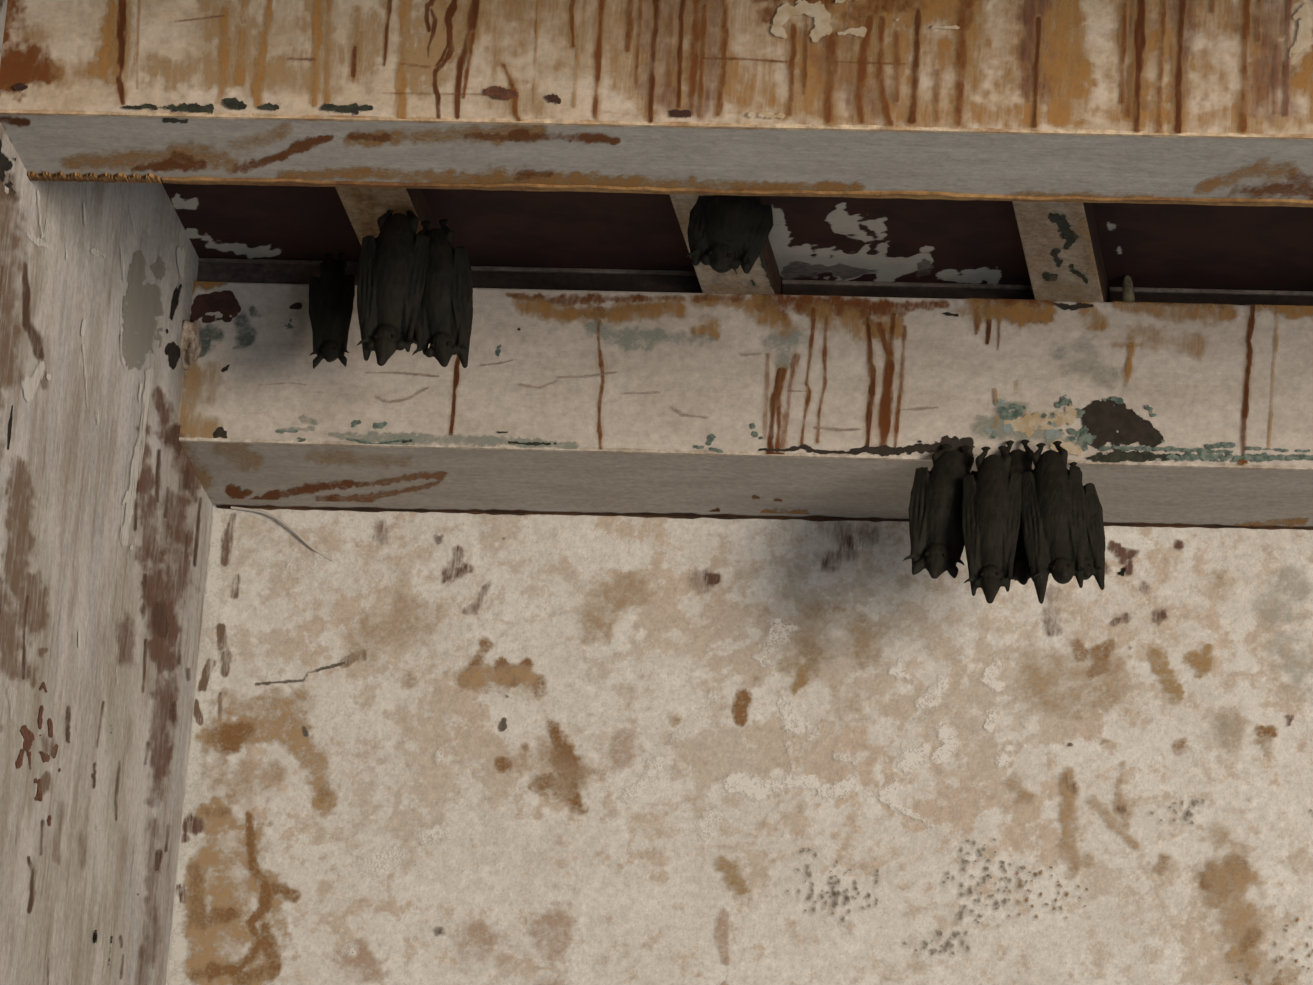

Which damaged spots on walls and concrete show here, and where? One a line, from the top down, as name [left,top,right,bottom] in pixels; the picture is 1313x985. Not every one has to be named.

peeling [771,0,867,42]
peeling [123,97,279,124]
peeling [322,103,373,115]
corrosion [0,0,1313,192]
corrosion [507,293,949,454]
peeling [750,388,1313,465]
corrosion [1105,541,1147,589]
corrosion [118,362,447,985]
damp [196,691,337,816]
damp [723,695,862,801]
damp [878,659,961,827]
damp [184,773,299,985]